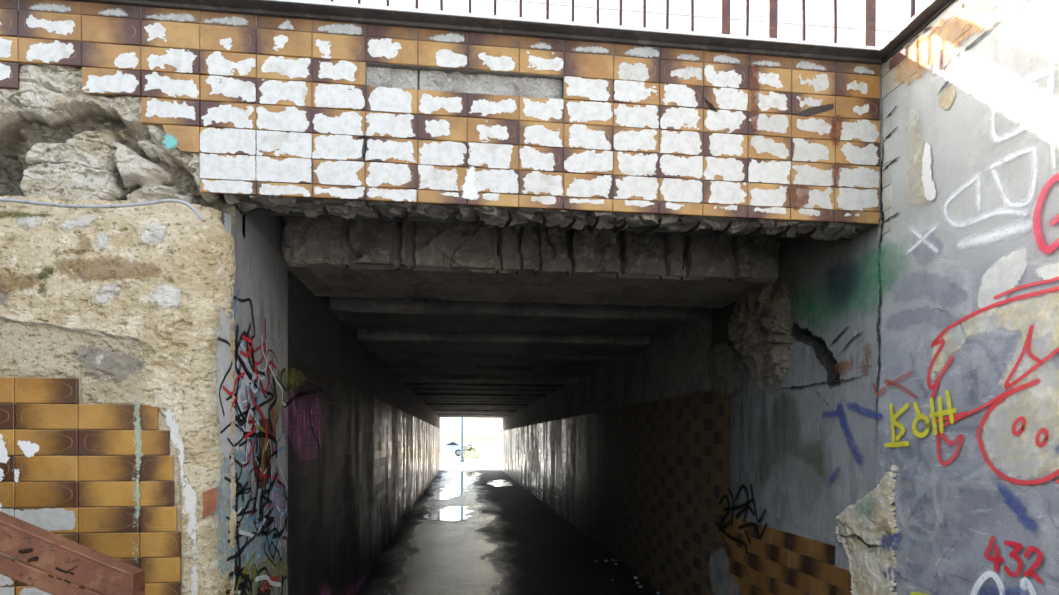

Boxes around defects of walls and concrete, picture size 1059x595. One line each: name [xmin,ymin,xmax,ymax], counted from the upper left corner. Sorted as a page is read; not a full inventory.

spalling [0,14,880,243]
crack [776,105,899,431]
peeling [149,284,182,309]
peeling [0,434,40,482]
peeling [0,503,76,531]
flaking render [835,465,899,595]
peeling [1,548,39,562]
peeling [0,574,52,595]
peeling [48,566,85,589]